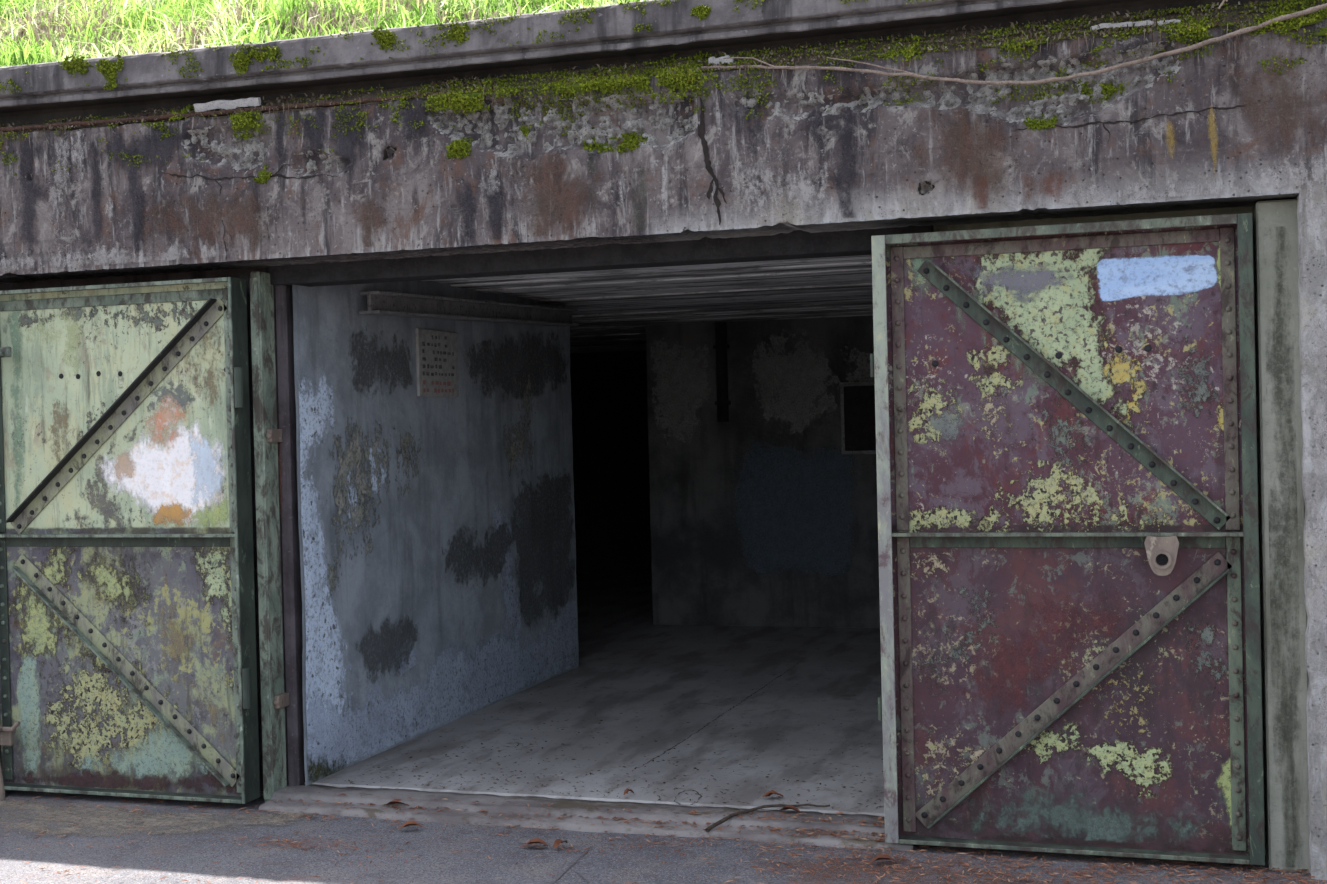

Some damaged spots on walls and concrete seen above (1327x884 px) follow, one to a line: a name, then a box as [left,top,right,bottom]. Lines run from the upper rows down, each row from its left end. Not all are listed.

leakage [0,126,263,271]
leakage [275,118,284,156]
leakage [305,109,362,173]
leakage [462,155,599,240]
crack [698,98,727,225]
leakage [734,97,856,218]
peeling [18,301,197,333]
peeling [951,232,1153,433]
peeling [67,426,144,532]
peeling [899,345,1170,533]
peeling [8,563,180,772]
peeling [1025,674,1171,797]